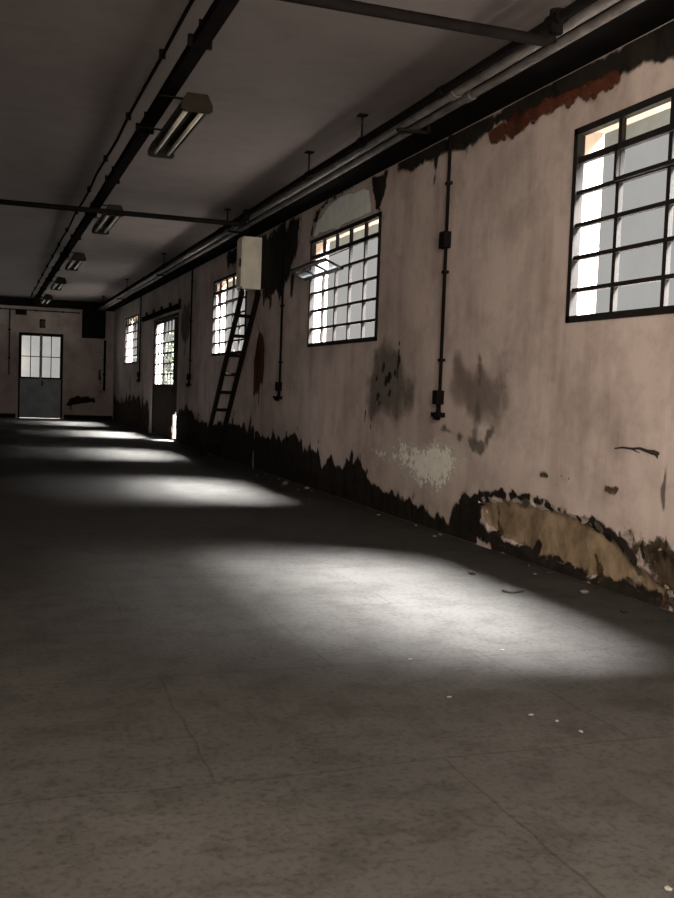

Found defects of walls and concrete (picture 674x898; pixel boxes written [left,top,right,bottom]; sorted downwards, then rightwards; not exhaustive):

peeling [488,70,621,144]
damp [365,341,413,428]
damp [455,358,499,418]
damp [176,405,493,544]
spalling [459,488,674,607]